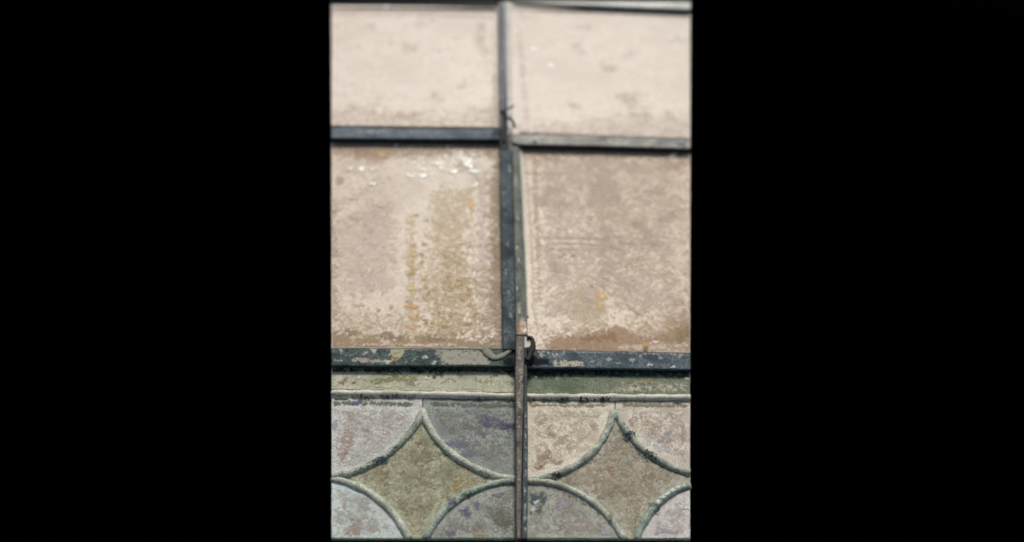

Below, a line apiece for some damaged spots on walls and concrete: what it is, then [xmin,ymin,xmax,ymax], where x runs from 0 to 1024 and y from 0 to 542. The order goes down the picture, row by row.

rust [404,186,487,342]